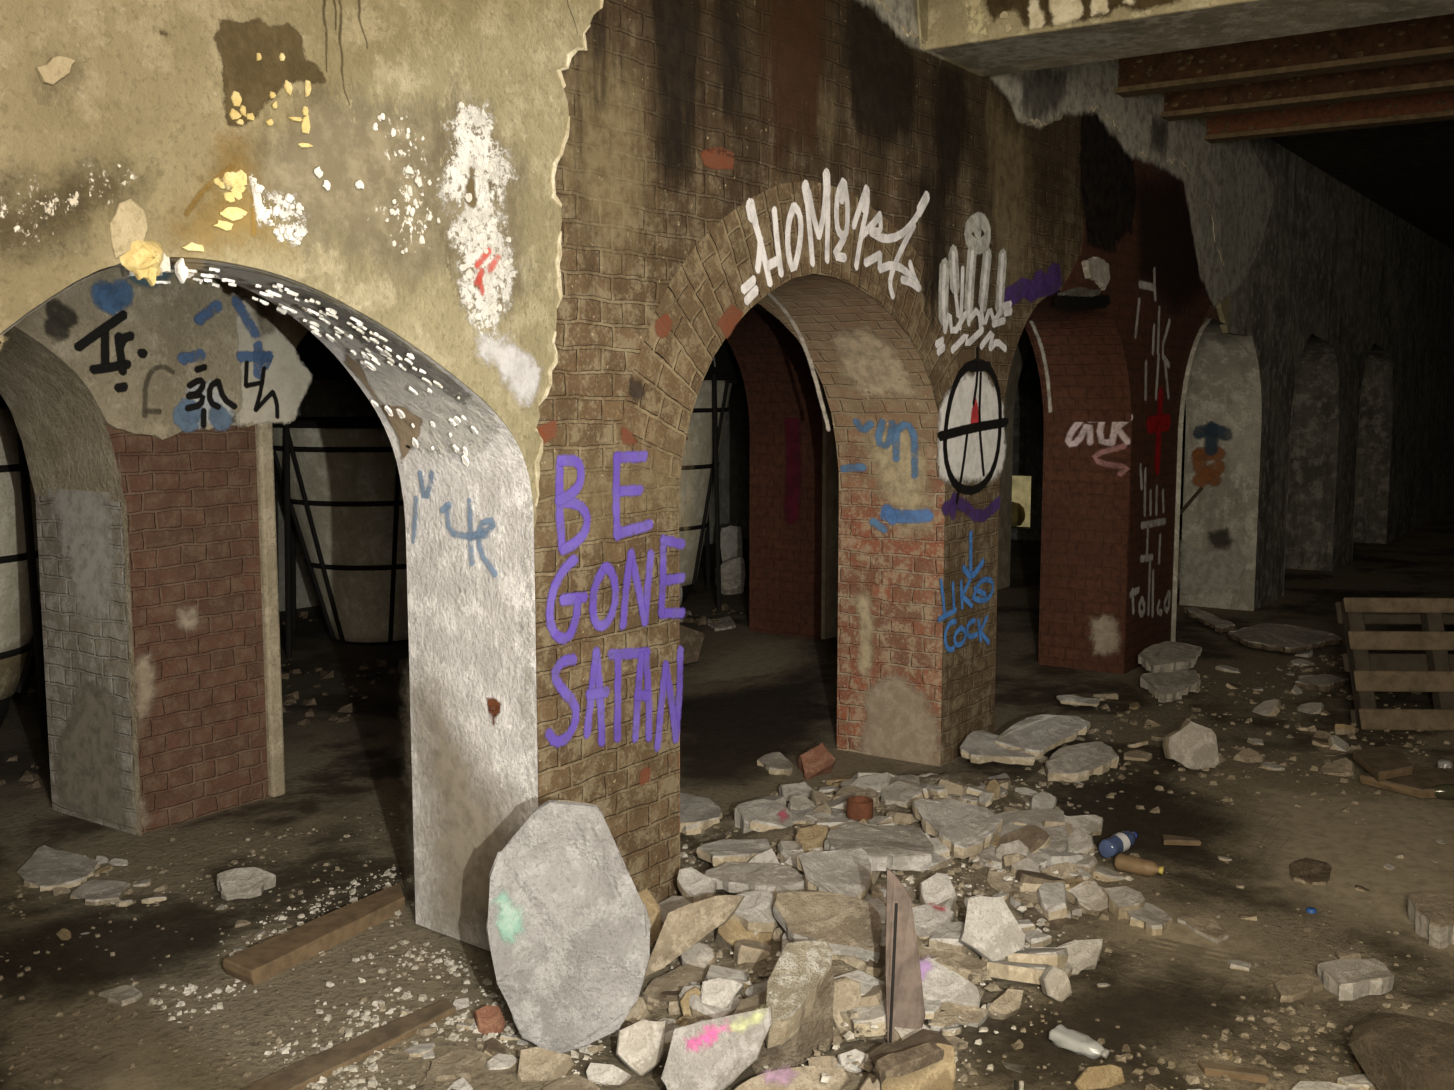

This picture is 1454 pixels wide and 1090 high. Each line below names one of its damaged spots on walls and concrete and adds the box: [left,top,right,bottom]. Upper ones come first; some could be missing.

water stain [654,0,699,180]
water stain [720,0,741,118]
water stain [771,0,823,152]
water stain [846,0,922,143]
peeling [212,0,1224,904]